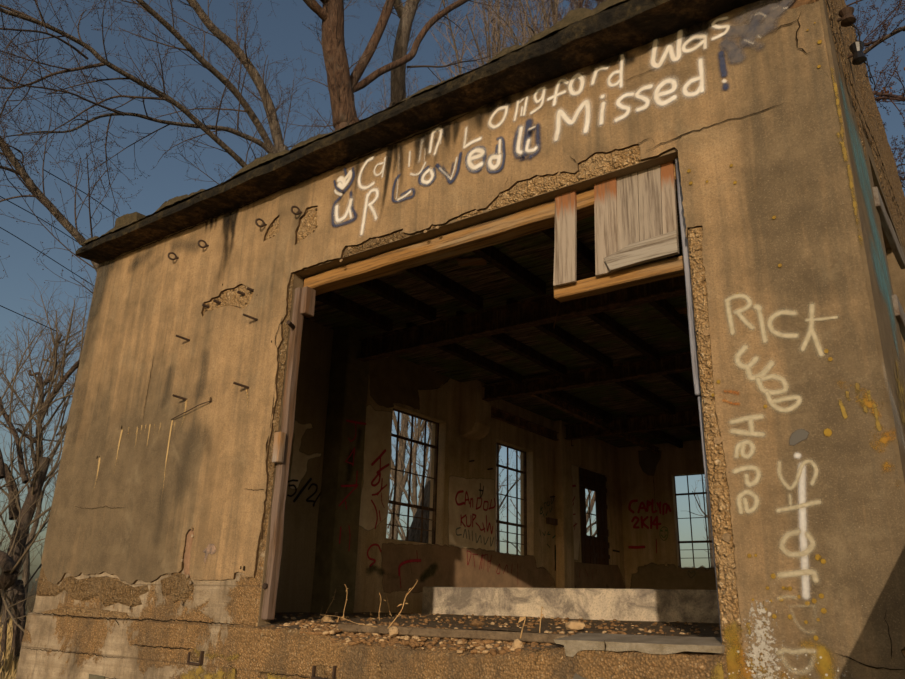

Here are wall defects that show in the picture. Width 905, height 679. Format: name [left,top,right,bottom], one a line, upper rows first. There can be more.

crack [771,13,810,54]
crack [640,103,784,151]
crack [831,2,905,224]
damp [205,207,238,247]
spalling [201,284,253,317]
spalling [254,144,676,593]
spalling [35,529,194,609]